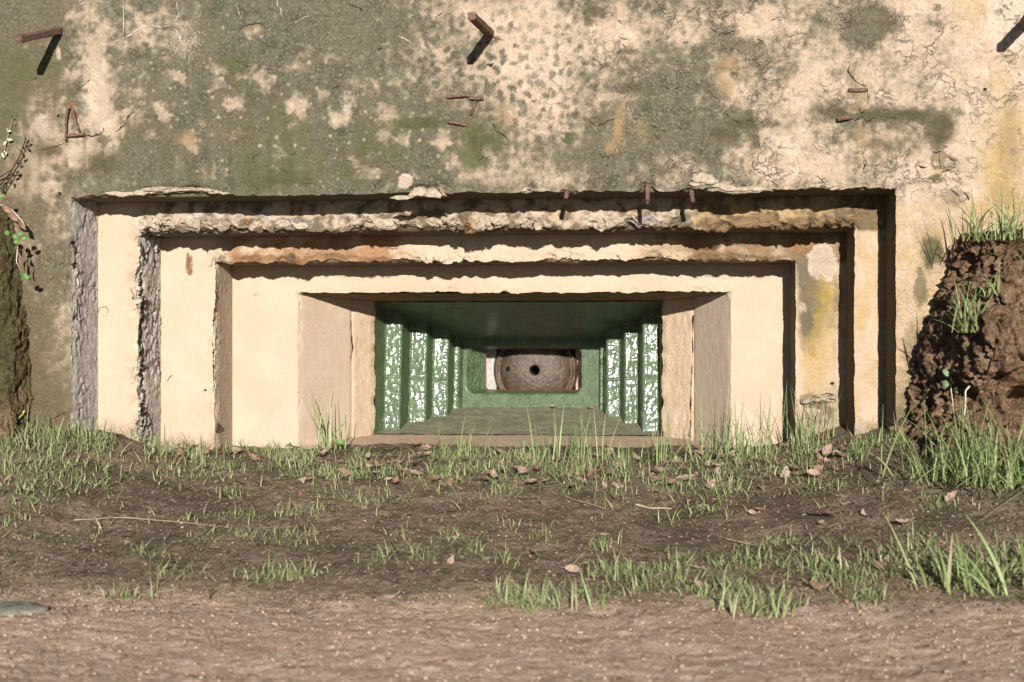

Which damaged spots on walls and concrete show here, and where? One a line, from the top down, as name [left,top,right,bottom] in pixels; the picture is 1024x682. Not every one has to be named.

rust [15,27,63,43]
rust [468,12,494,38]
crack [847,66,898,122]
rust [64,102,85,141]
rust [447,94,484,127]
spalling [390,185,447,200]
spalling [351,214,556,232]
spalling [589,214,659,233]
rust [238,253,391,265]
spalling [137,272,156,429]